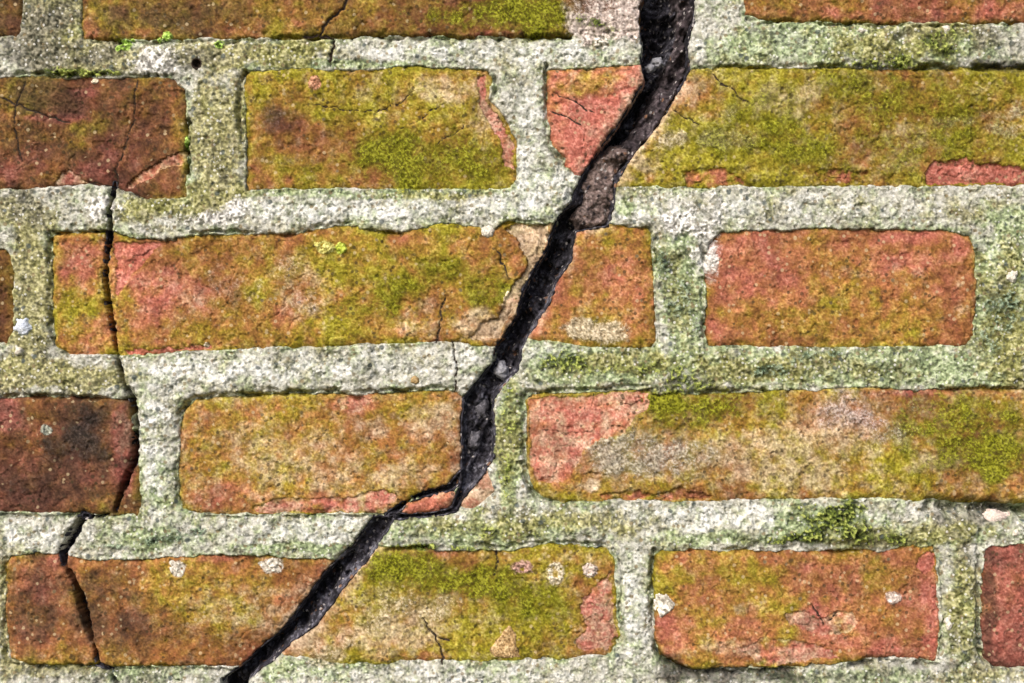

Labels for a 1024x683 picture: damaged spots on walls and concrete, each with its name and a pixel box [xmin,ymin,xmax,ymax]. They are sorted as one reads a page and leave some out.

crack [2,81,71,160]
crack [91,81,144,351]
crack [222,0,748,683]
crack [59,390,140,566]
crack [82,593,92,627]
crack [94,652,115,670]